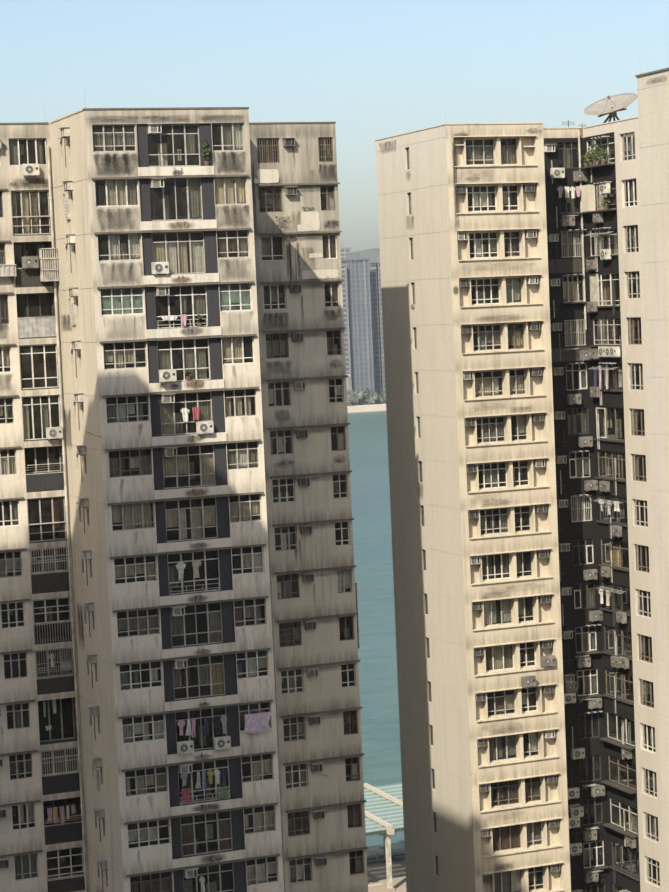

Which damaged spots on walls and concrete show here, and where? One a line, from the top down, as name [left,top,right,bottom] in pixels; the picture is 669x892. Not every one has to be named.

damp [94,154,130,173]
damp [213,152,241,171]